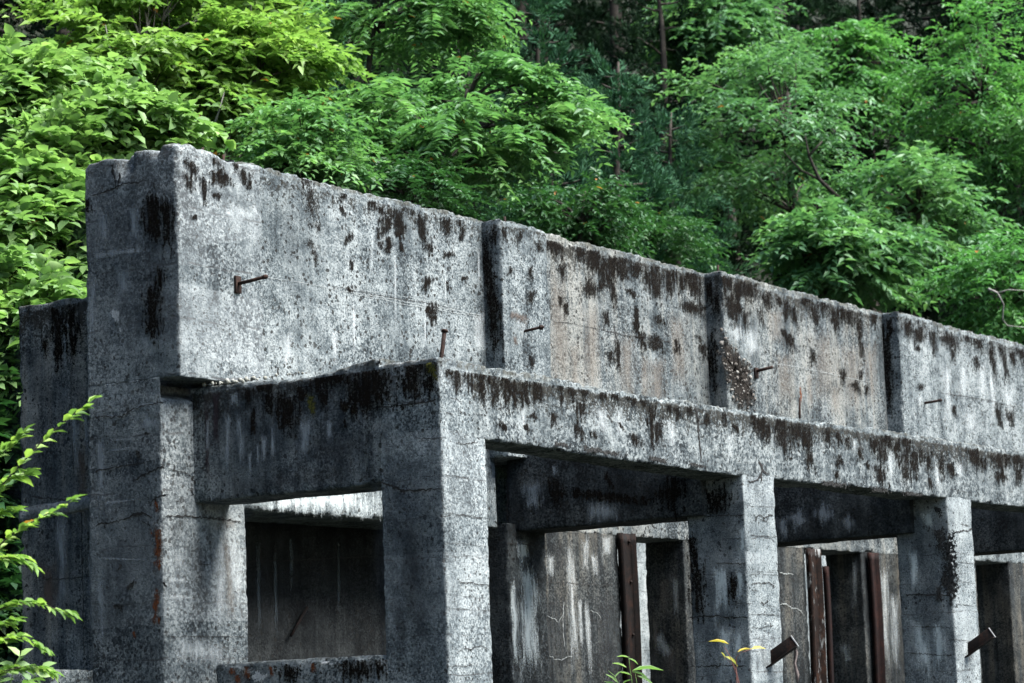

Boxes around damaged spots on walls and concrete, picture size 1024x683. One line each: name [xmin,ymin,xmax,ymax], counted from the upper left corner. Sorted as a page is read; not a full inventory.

damp [84,198,106,237]
damp [99,191,178,291]
damp [367,200,416,254]
damp [425,216,465,259]
damp [63,285,94,370]
spalling [717,328,757,412]
damp [995,403,1016,430]
damp [822,427,959,492]
damp [966,447,1024,487]
rust [150,529,165,570]
rust [151,588,160,625]
damp [511,574,536,658]